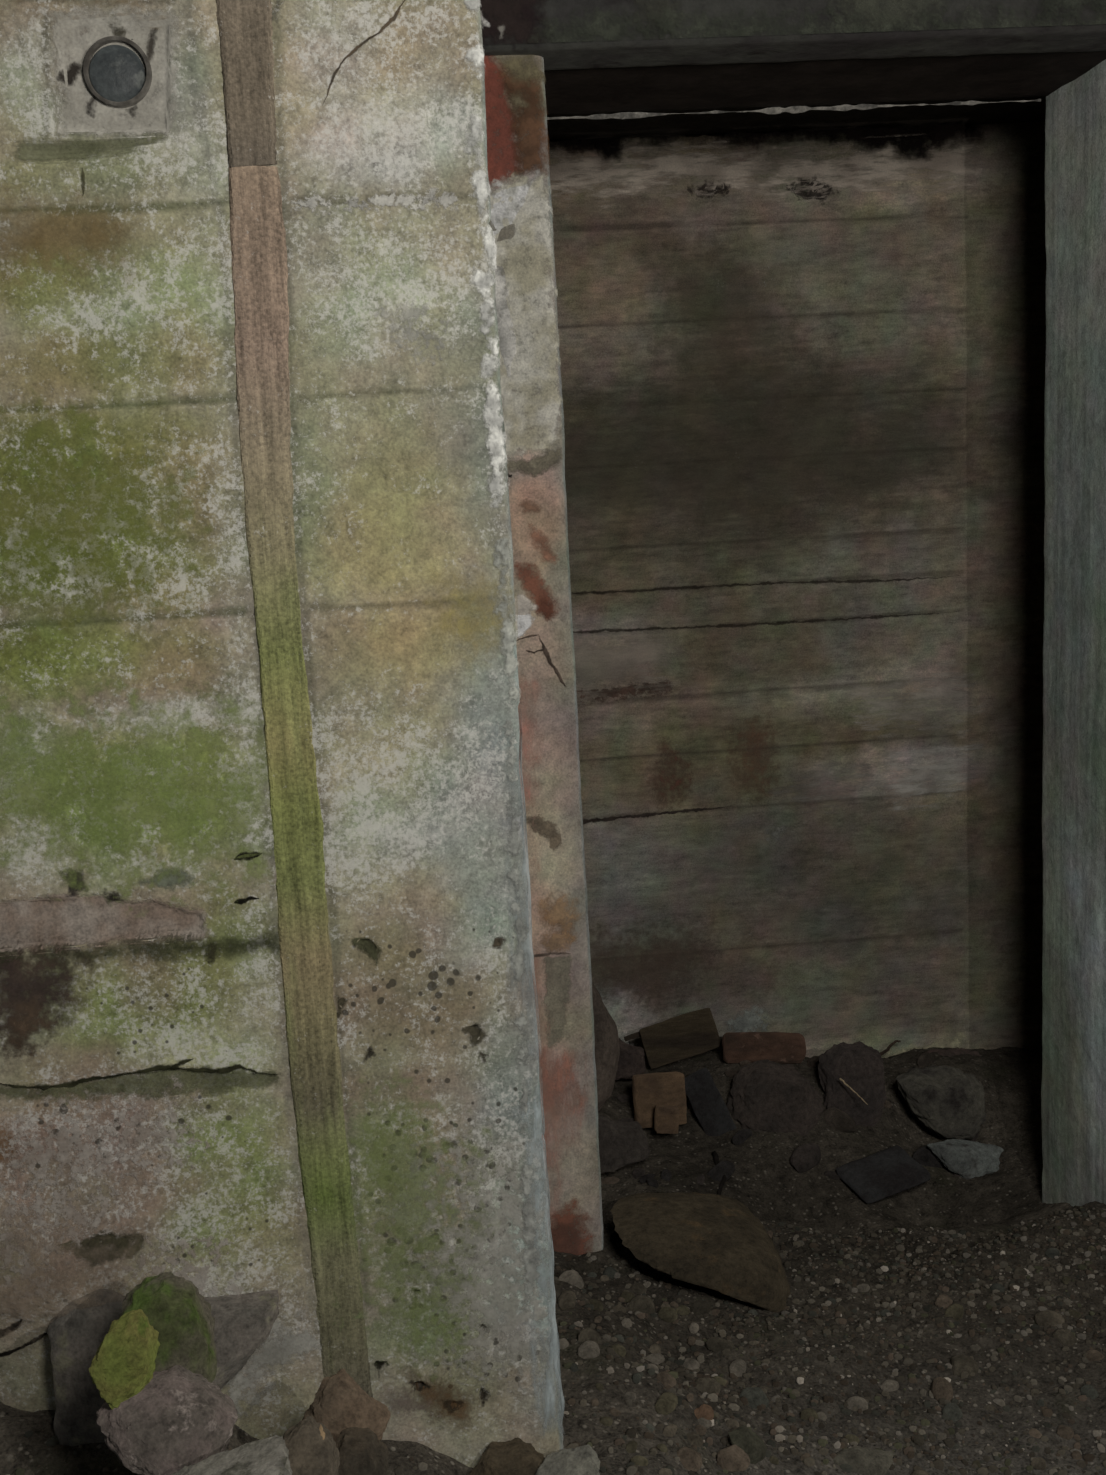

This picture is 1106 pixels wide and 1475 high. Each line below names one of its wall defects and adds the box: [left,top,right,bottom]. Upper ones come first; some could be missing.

crack [323,0,405,104]
rust [515,532,556,619]
water stain [0,946,76,1055]
crack [0,1058,277,1090]